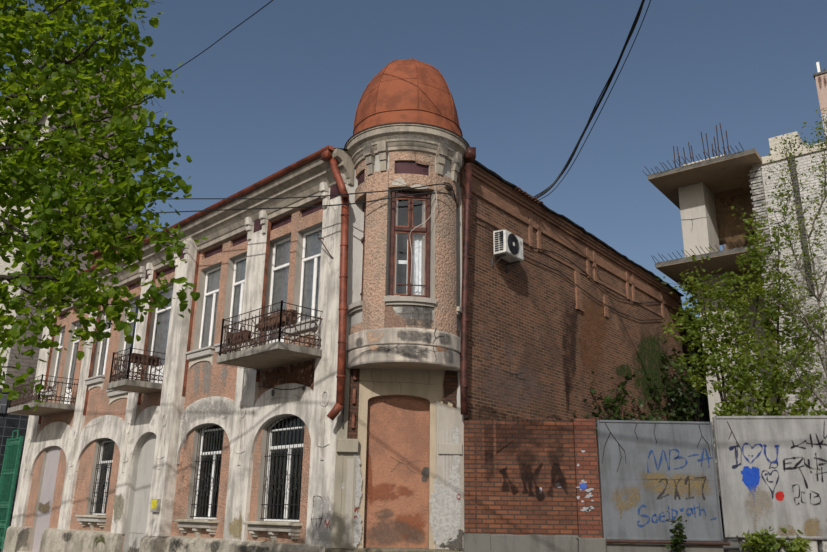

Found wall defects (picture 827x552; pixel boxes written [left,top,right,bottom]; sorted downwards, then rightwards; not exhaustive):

crack [359,312,444,392]
leakage [377,305,453,363]
leakage [563,310,577,409]
peeling [345,453,368,552]
peeling [422,455,464,551]